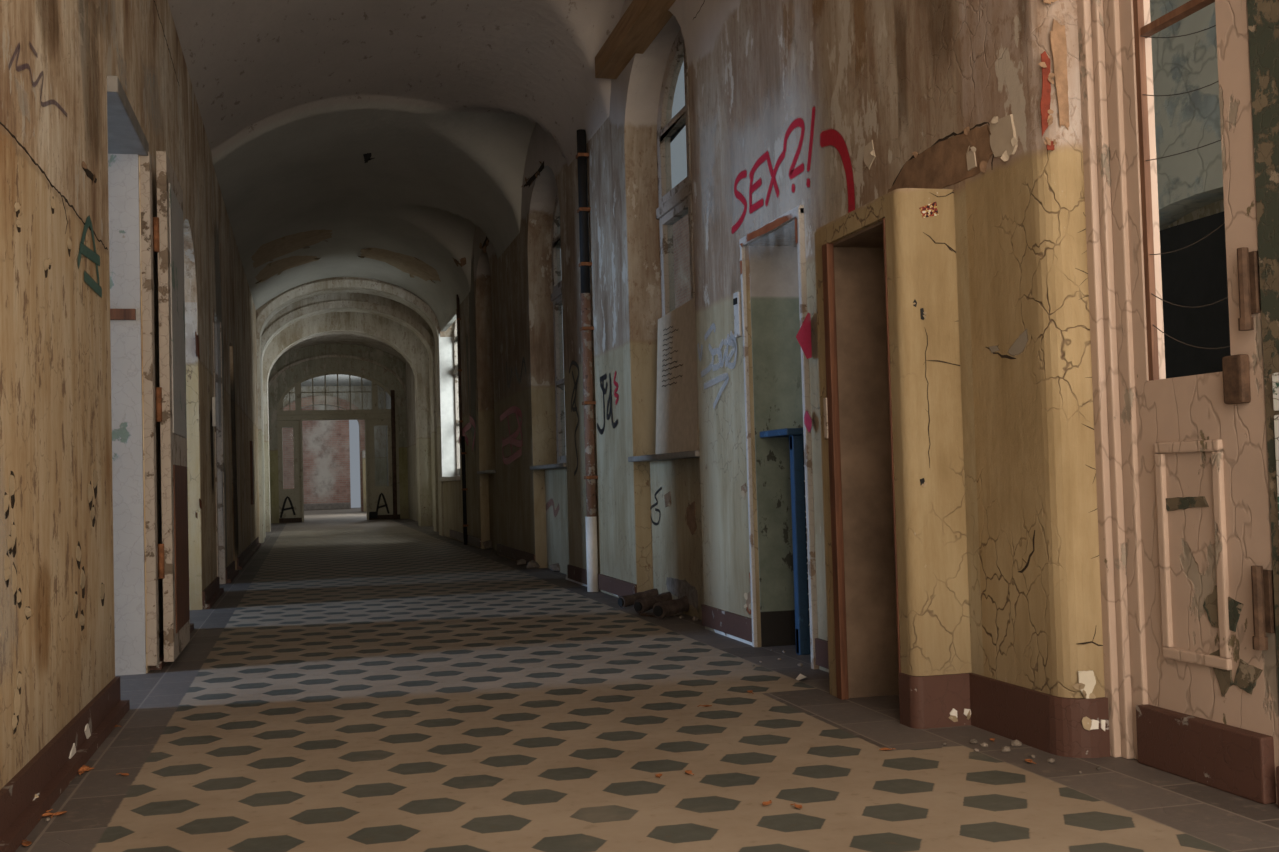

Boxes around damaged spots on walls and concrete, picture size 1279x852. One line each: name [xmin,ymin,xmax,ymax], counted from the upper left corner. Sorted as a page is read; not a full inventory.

flaking render [1039,0,1069,151]
crack [0,122,108,250]
spalling [888,114,1018,193]
crack [923,232,956,253]
crack [986,346,1016,359]
crack [923,327,960,468]
crack [1018,530,1035,573]